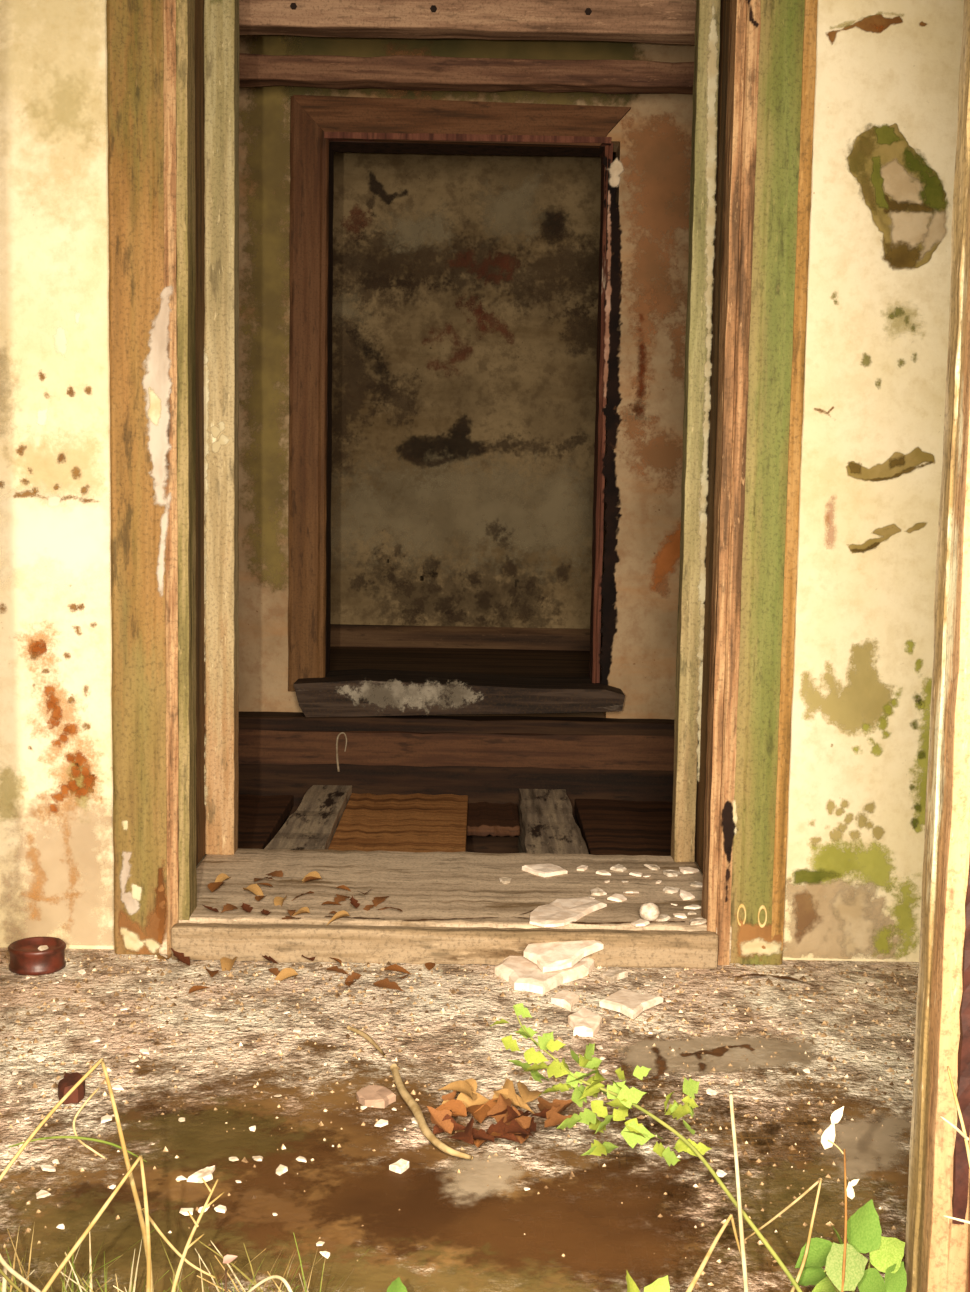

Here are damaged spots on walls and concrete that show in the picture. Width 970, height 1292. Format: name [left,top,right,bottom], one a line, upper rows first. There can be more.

flaking render [847,124,948,269]
water stain [332,208,599,474]
peeling [143,286,173,595]
flaking render [846,447,935,481]
flaking render [849,523,926,553]
water stain [352,547,544,627]
corrosion [26,632,97,815]
peeling [120,852,142,915]
flaking render [783,880,902,960]